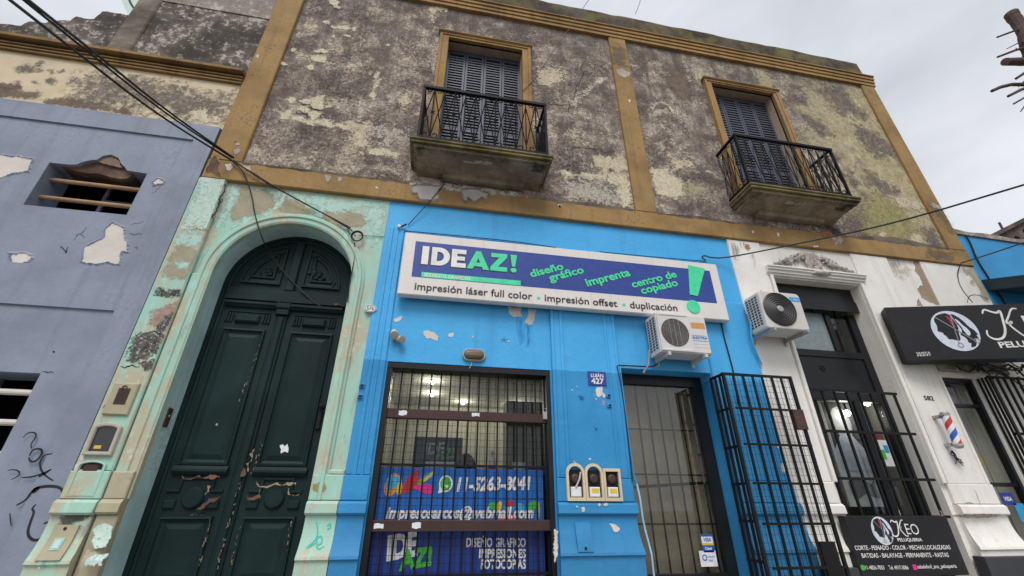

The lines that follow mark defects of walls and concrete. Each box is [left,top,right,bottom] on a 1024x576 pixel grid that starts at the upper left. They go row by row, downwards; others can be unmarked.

damp [785,94,835,137]
damp [819,81,897,159]
flaking render [0,153,36,179]
damp [242,162,410,185]
peeling [406,172,537,203]
damp [540,199,635,211]
damp [841,169,899,196]
flaking render [79,220,132,266]
peeling [125,143,386,371]
damp [826,202,953,260]
flaking render [912,261,939,306]
spalling [423,330,454,341]